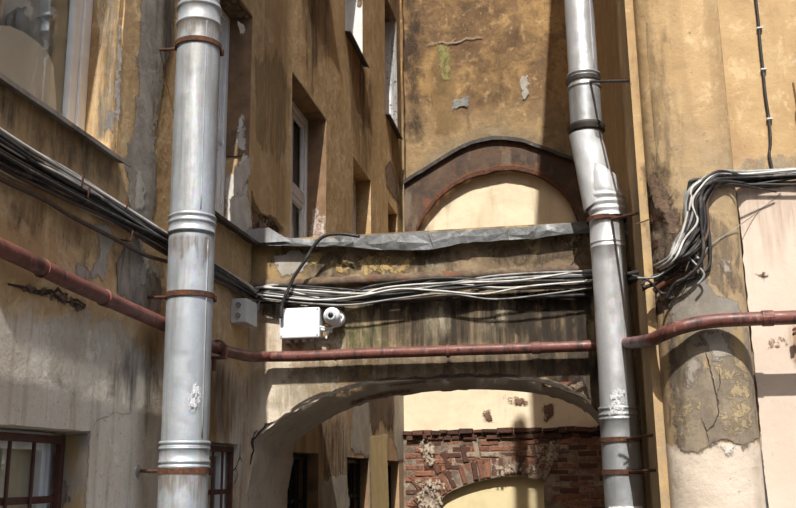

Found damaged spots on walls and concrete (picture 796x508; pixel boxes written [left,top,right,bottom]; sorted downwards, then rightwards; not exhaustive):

peeling [96,0,123,150]
peeling [125,0,175,222]
water stain [390,0,542,217]
spalling [224,114,278,239]
crack [8,283,86,312]
peeling [76,221,163,312]
water stain [263,300,330,318]
peeling [273,248,415,277]
water stain [361,289,593,346]
crack [702,354,721,440]
peeling [668,326,760,456]
peeling [415,478,448,508]